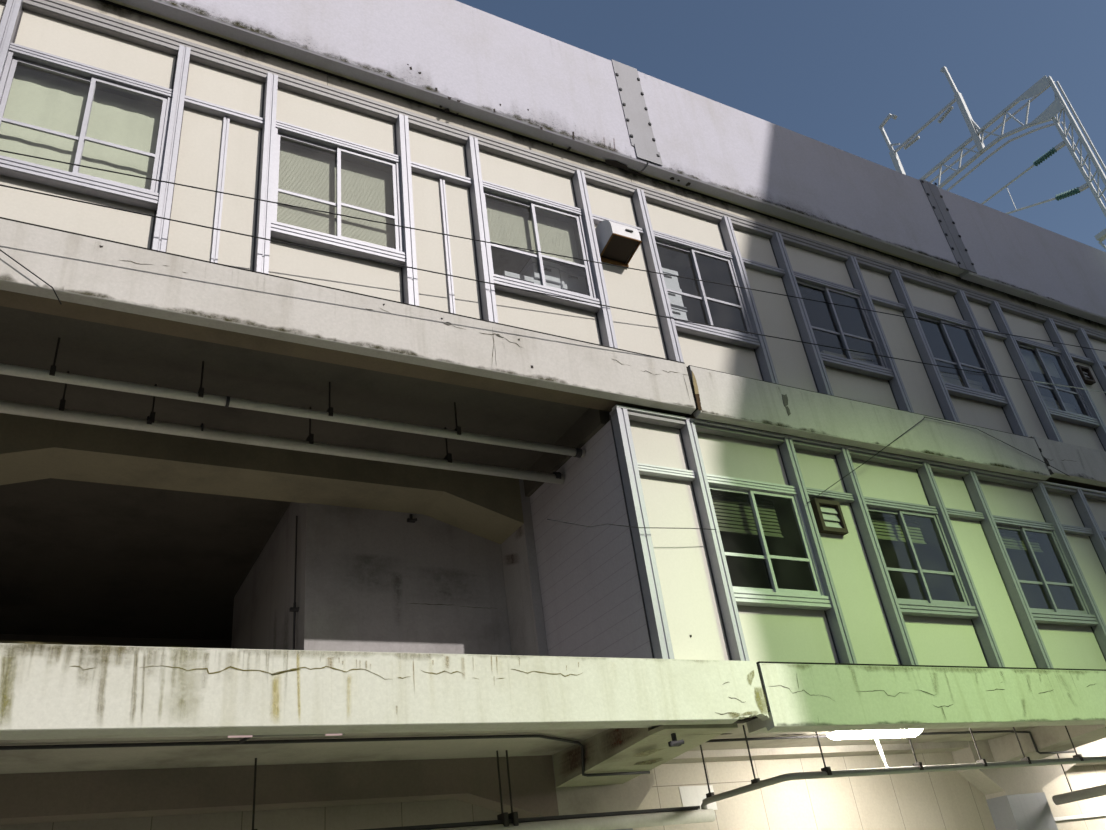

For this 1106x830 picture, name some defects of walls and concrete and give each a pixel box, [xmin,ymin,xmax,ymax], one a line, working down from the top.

crack [147,665,582,679]
damp [1,655,12,716]
crack [859,690,953,715]